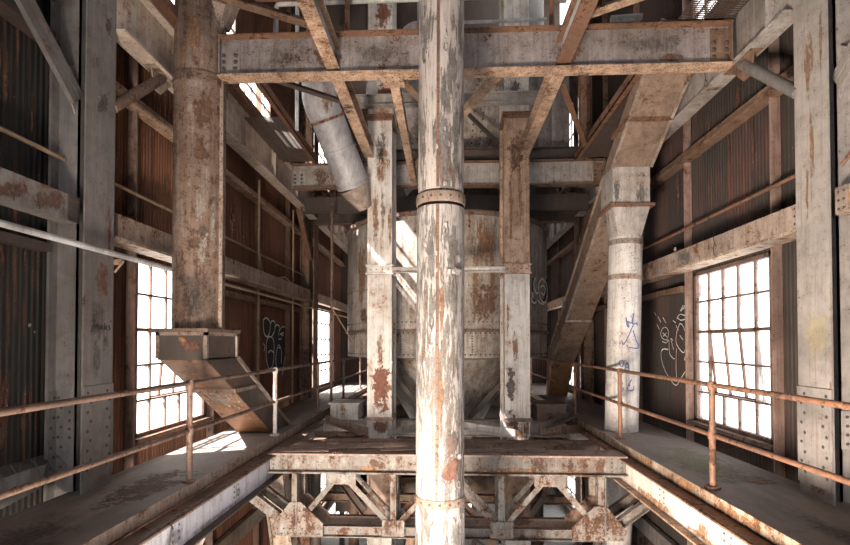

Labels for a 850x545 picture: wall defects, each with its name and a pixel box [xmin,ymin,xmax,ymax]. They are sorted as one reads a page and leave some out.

corrosion [193,88,213,160]
corrosion [0,182,64,209]
peeling [424,219,461,334]
corrosion [470,222,498,321]
peeling [441,431,461,489]
peeling [425,512,464,545]
corrosion [688,524,712,545]
corrosion [720,504,758,530]